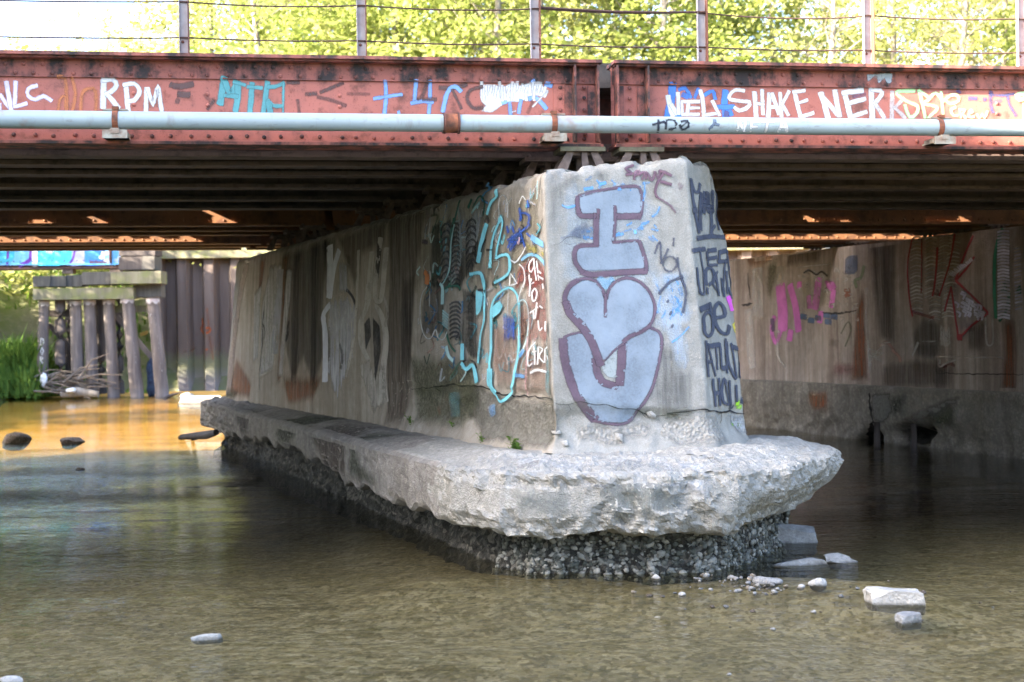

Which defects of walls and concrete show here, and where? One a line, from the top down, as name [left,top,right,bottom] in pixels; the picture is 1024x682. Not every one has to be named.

leakage [253,211,422,420]
crack [412,383,744,421]